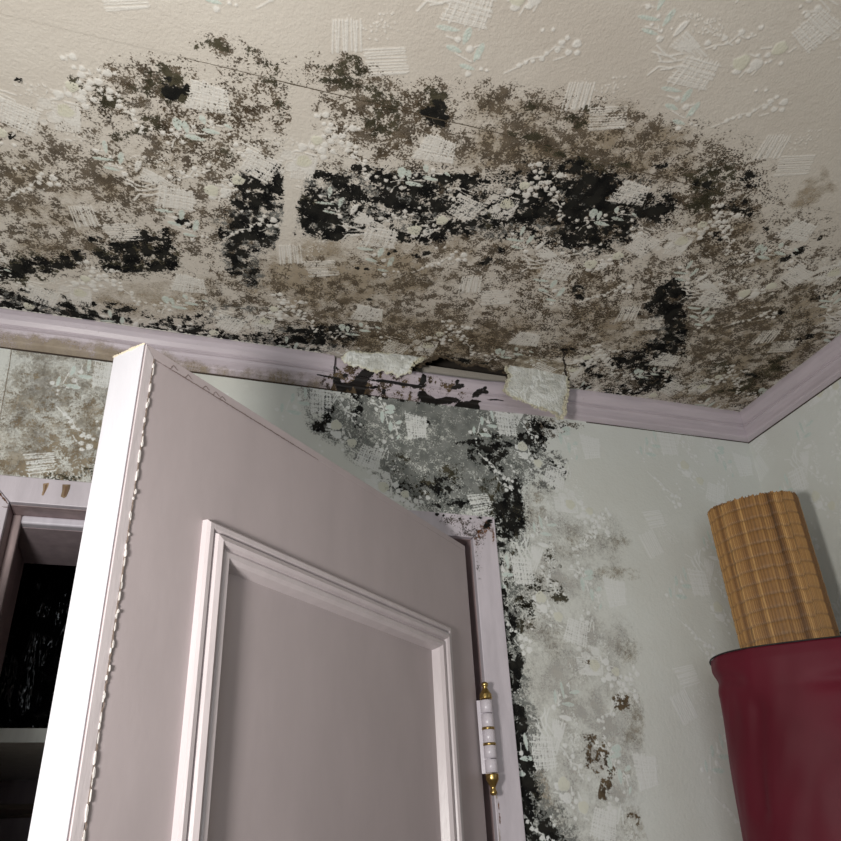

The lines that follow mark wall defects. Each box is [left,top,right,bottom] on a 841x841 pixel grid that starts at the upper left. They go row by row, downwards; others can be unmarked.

leakage [0,335,122,481]
leakage [0,33,841,411]
leakage [302,365,584,841]
leakage [543,651,643,802]